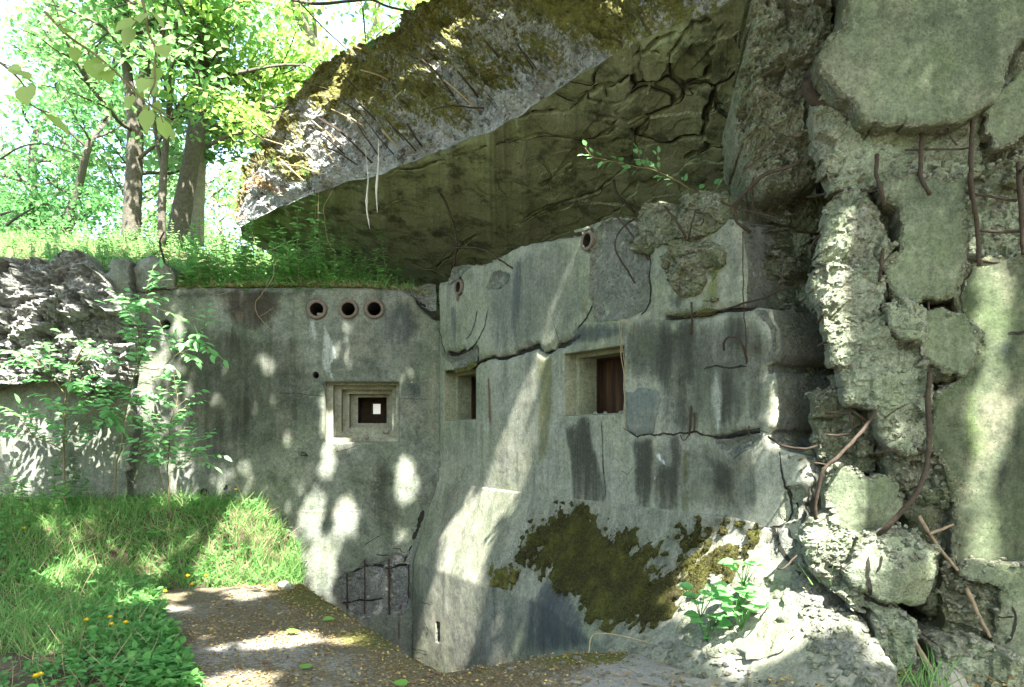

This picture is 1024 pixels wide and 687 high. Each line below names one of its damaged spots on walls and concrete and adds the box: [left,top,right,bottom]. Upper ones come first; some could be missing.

crack [395,37,740,226]
peeling [978,70,1024,155]
spalling [673,156,804,364]
crack [403,301,594,460]
leakage [713,329,759,433]
peeling [918,307,985,378]
leakage [567,418,604,502]
leakage [634,436,679,507]
crack [601,424,801,576]
spalling [339,549,410,620]